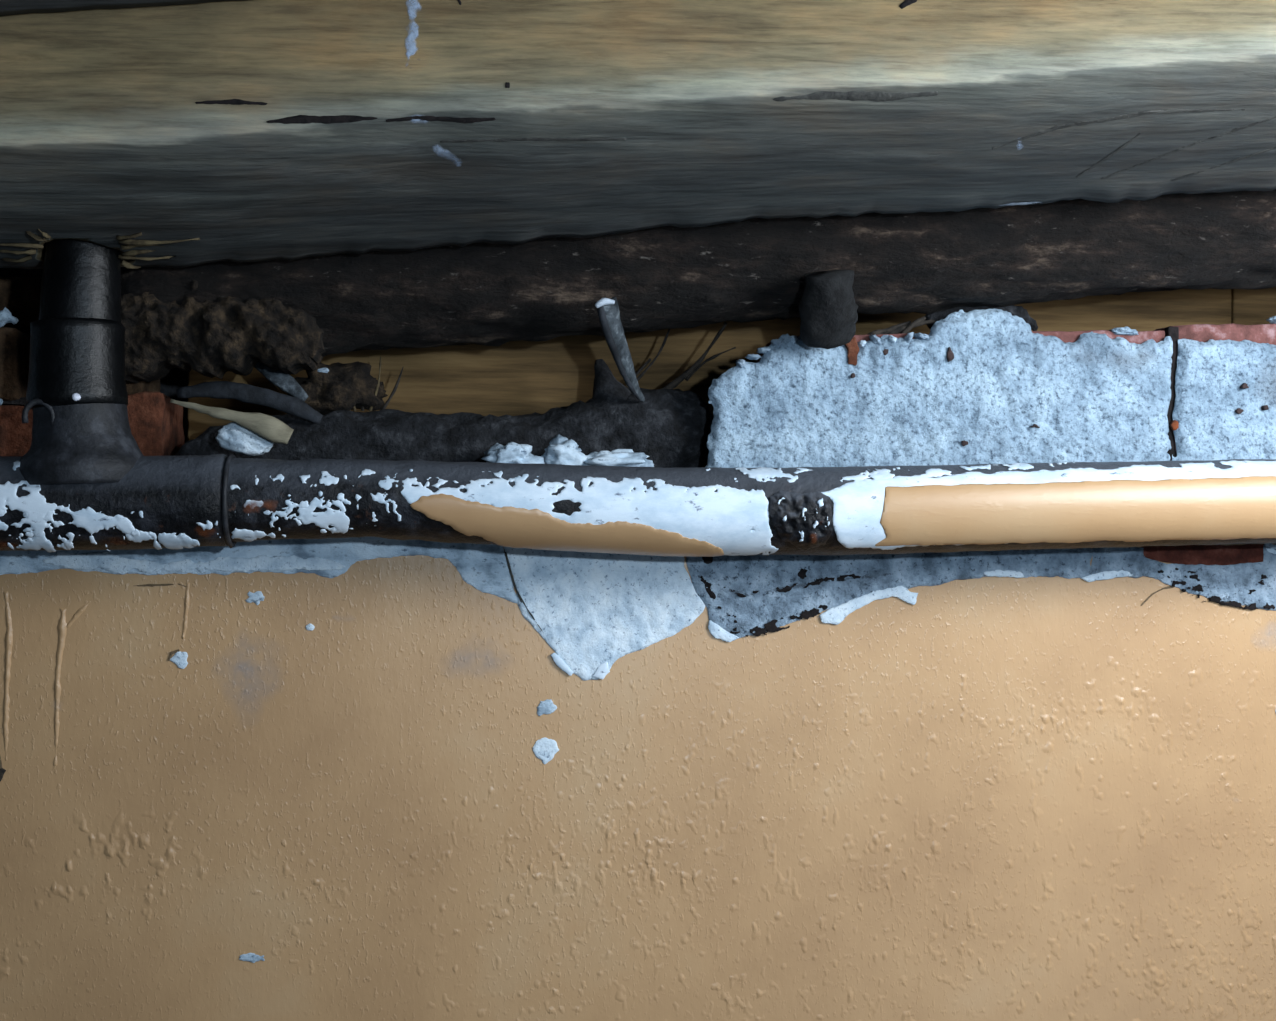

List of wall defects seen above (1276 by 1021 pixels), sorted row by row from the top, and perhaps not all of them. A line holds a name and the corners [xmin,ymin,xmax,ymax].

crack [1165,327,1179,458]
flaking render [0,307,1276,680]
crack [0,756,8,781]